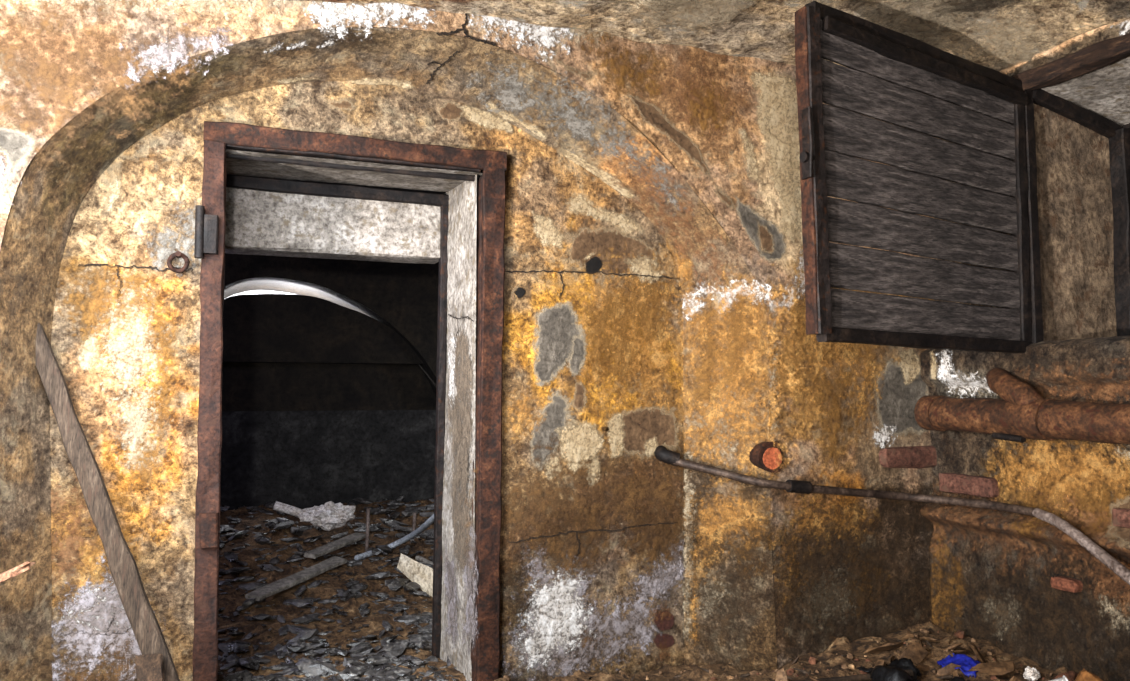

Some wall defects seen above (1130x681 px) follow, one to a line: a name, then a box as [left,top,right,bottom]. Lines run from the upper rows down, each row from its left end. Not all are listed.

water stain [0,0,437,152]
crack [426,13,496,84]
crack [78,263,193,296]
spalling [502,301,679,485]
water stain [499,244,1130,681]
spalling [872,348,1000,498]
spalling [1105,497,1130,547]